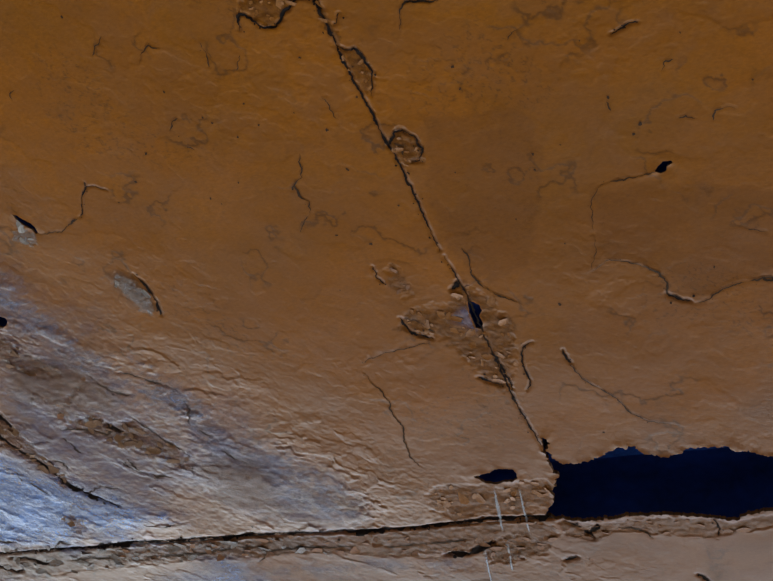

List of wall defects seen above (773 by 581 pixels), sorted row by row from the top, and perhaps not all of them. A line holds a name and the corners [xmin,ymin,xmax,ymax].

peeling [236,0,297,25]
crack [236,0,544,466]
crack [588,172,773,304]
peeling [114,276,153,315]
peeling [0,317,61,380]
peeling [402,284,519,390]
crack [89,372,212,436]
crack [562,351,678,426]
crack [0,415,194,508]
spalling [430,437,773,540]
crack [0,515,600,580]
peeling [453,531,558,560]